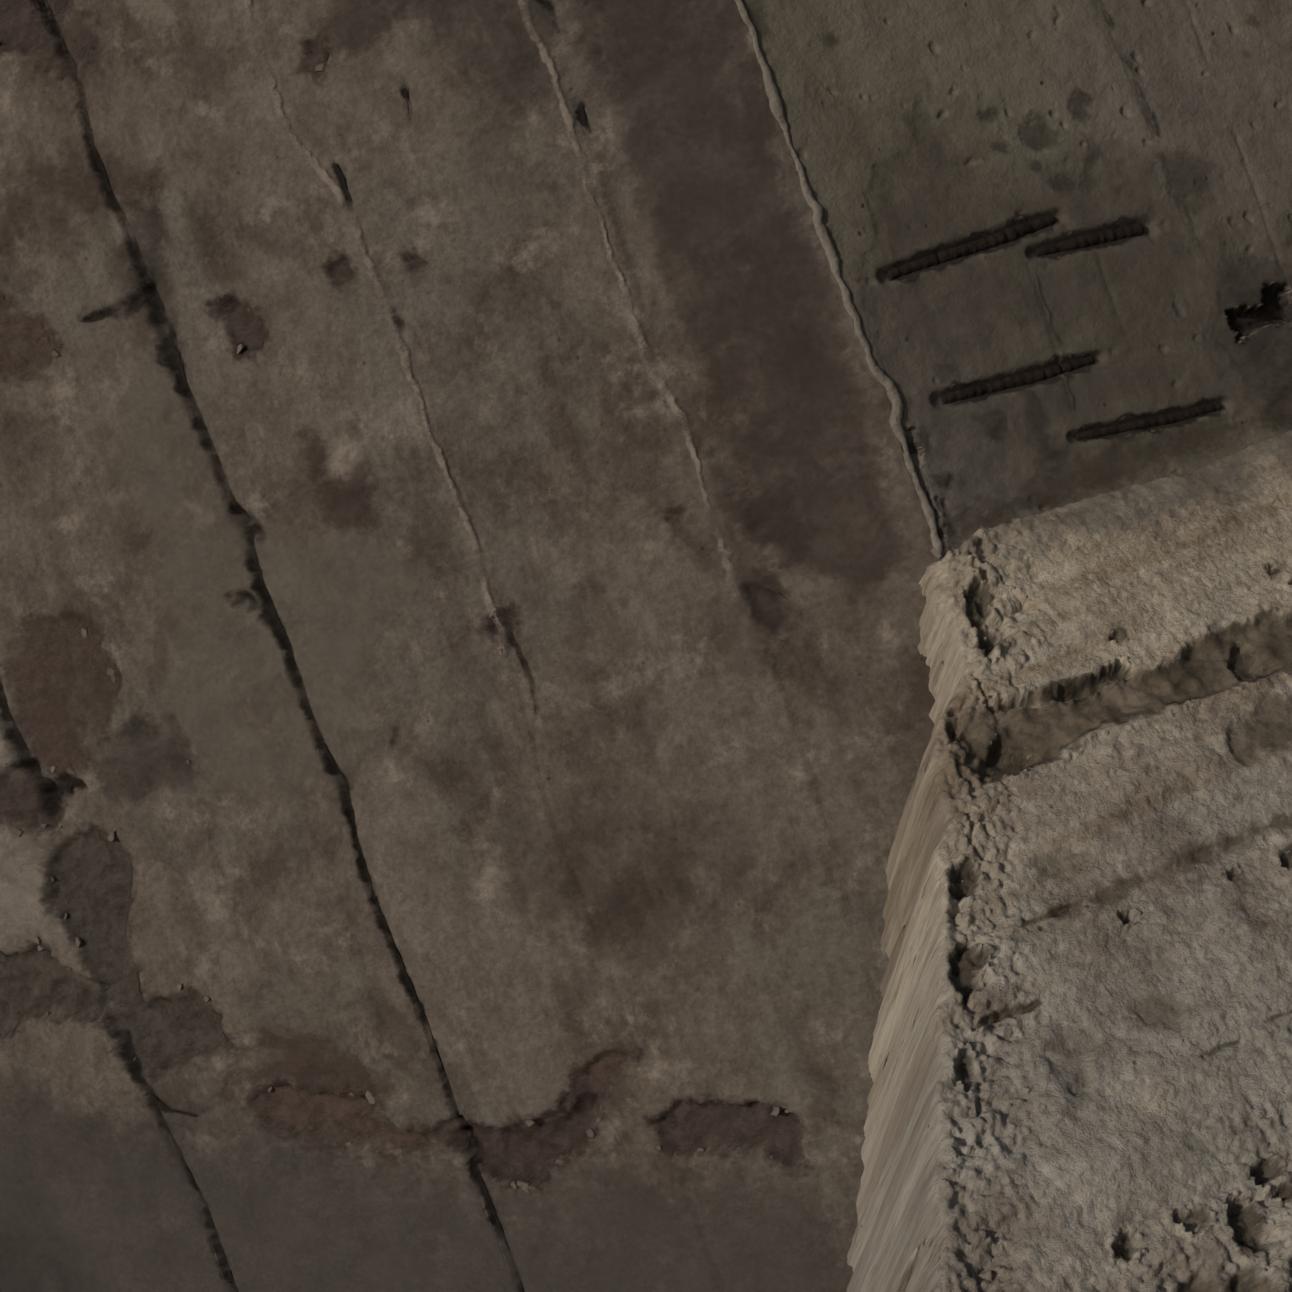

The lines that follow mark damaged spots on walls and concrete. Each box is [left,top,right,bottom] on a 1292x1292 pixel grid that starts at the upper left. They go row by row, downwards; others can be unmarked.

crack [575,101,589,131]
crack [83,136,122,211]
crack [332,162,350,202]
spalling [887,213,1144,282]
spalling [1225,284,1292,342]
spalling [940,353,1095,405]
spalling [1075,398,1221,441]
crack [507,630,537,715]
crack [0,683,84,808]
crack [82,241,524,1292]
crack [975,1000,1041,1029]
water stain [0,1084,839,1292]